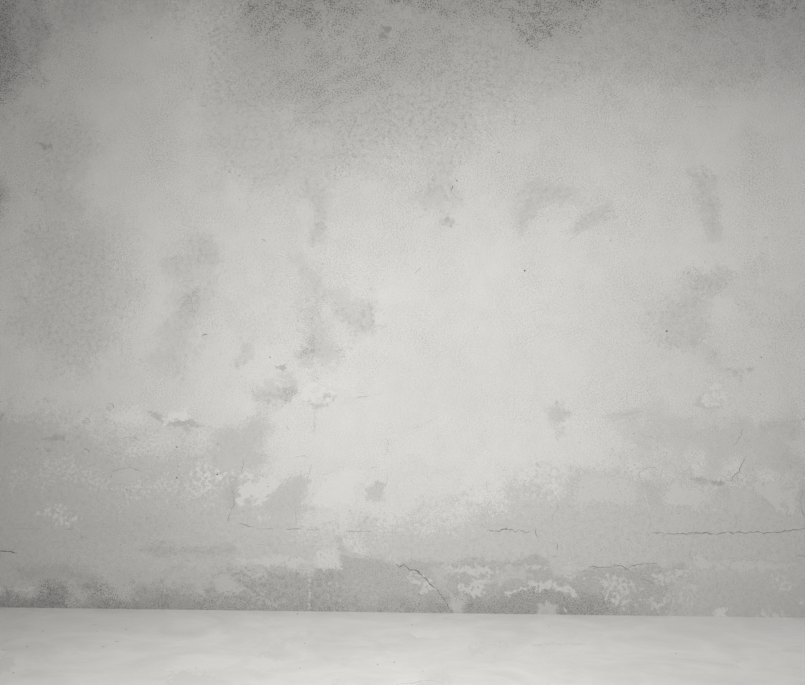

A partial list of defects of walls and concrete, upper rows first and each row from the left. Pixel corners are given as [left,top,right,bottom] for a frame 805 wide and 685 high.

leakage [0,0,805,252]
leakage [0,175,805,618]
peeling [441,560,699,616]
crack [639,467,805,552]